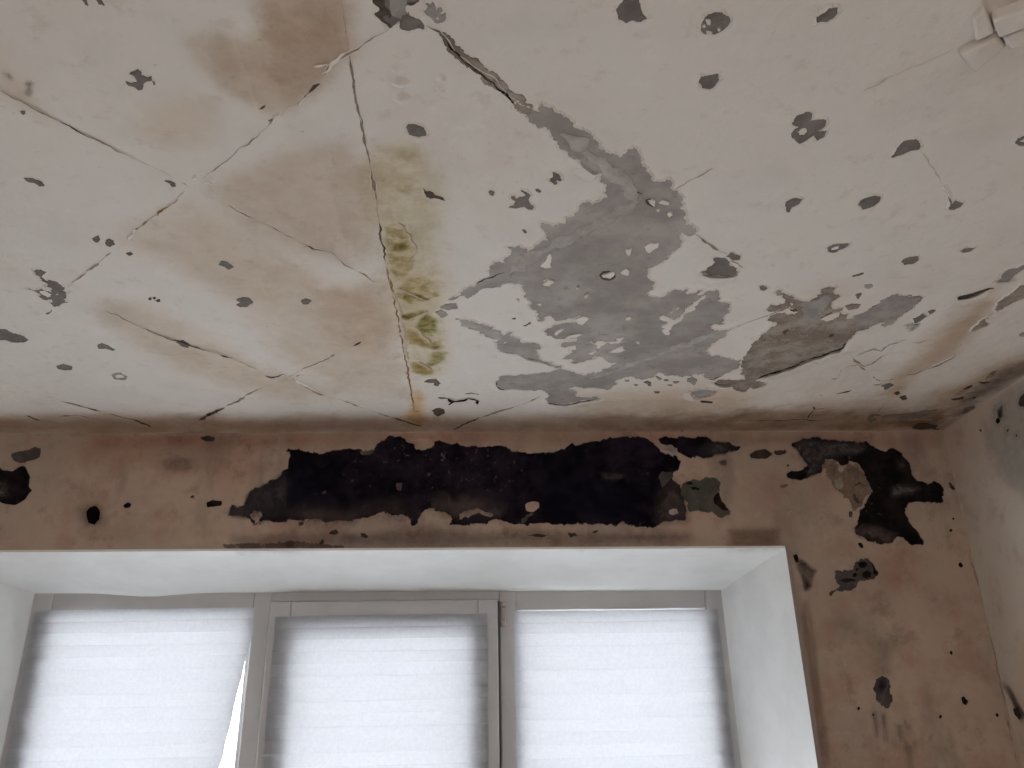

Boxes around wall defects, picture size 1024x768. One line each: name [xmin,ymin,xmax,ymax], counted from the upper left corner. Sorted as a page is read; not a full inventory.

peeling [369,0,451,34]
crack [0,6,540,430]
peeling [435,100,936,408]
peeling [23,267,73,315]
crack [741,339,956,421]
flaking render [681,477,730,518]
flaking render [823,459,871,517]
flaking render [829,558,879,596]
peeling [873,676,893,709]